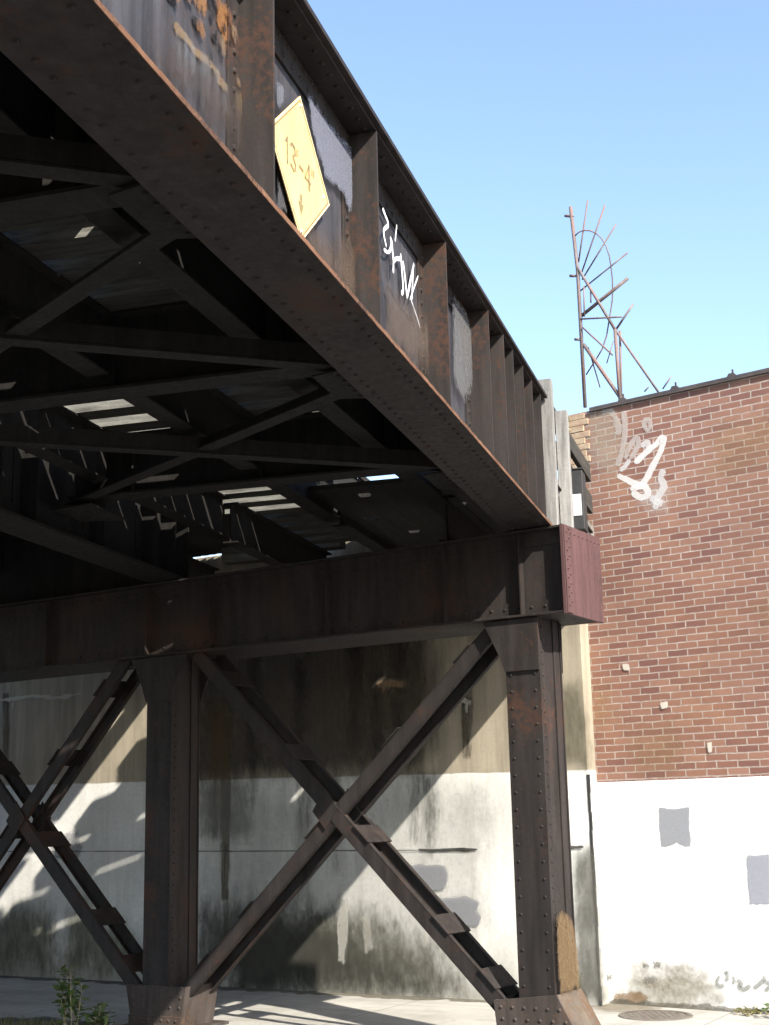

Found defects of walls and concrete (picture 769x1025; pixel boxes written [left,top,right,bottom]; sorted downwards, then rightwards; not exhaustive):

rust [177,0,237,55]
leakage [199,680,288,780]
leakage [230,640,429,777]
leakage [232,899,458,992]
rust [556,911,580,993]
leakage [575,852,769,1014]